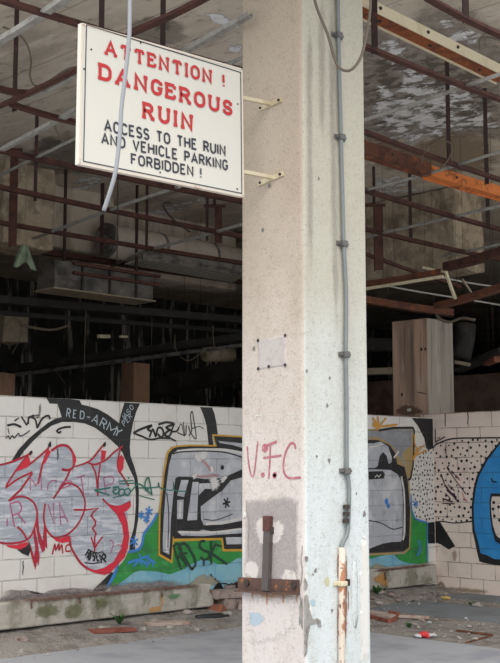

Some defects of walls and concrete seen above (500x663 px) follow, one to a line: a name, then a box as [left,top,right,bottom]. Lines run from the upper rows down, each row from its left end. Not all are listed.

leakage [416,11,500,64]
leakage [363,23,500,171]
spalling [299,577,321,657]
corrosion [337,561,349,638]